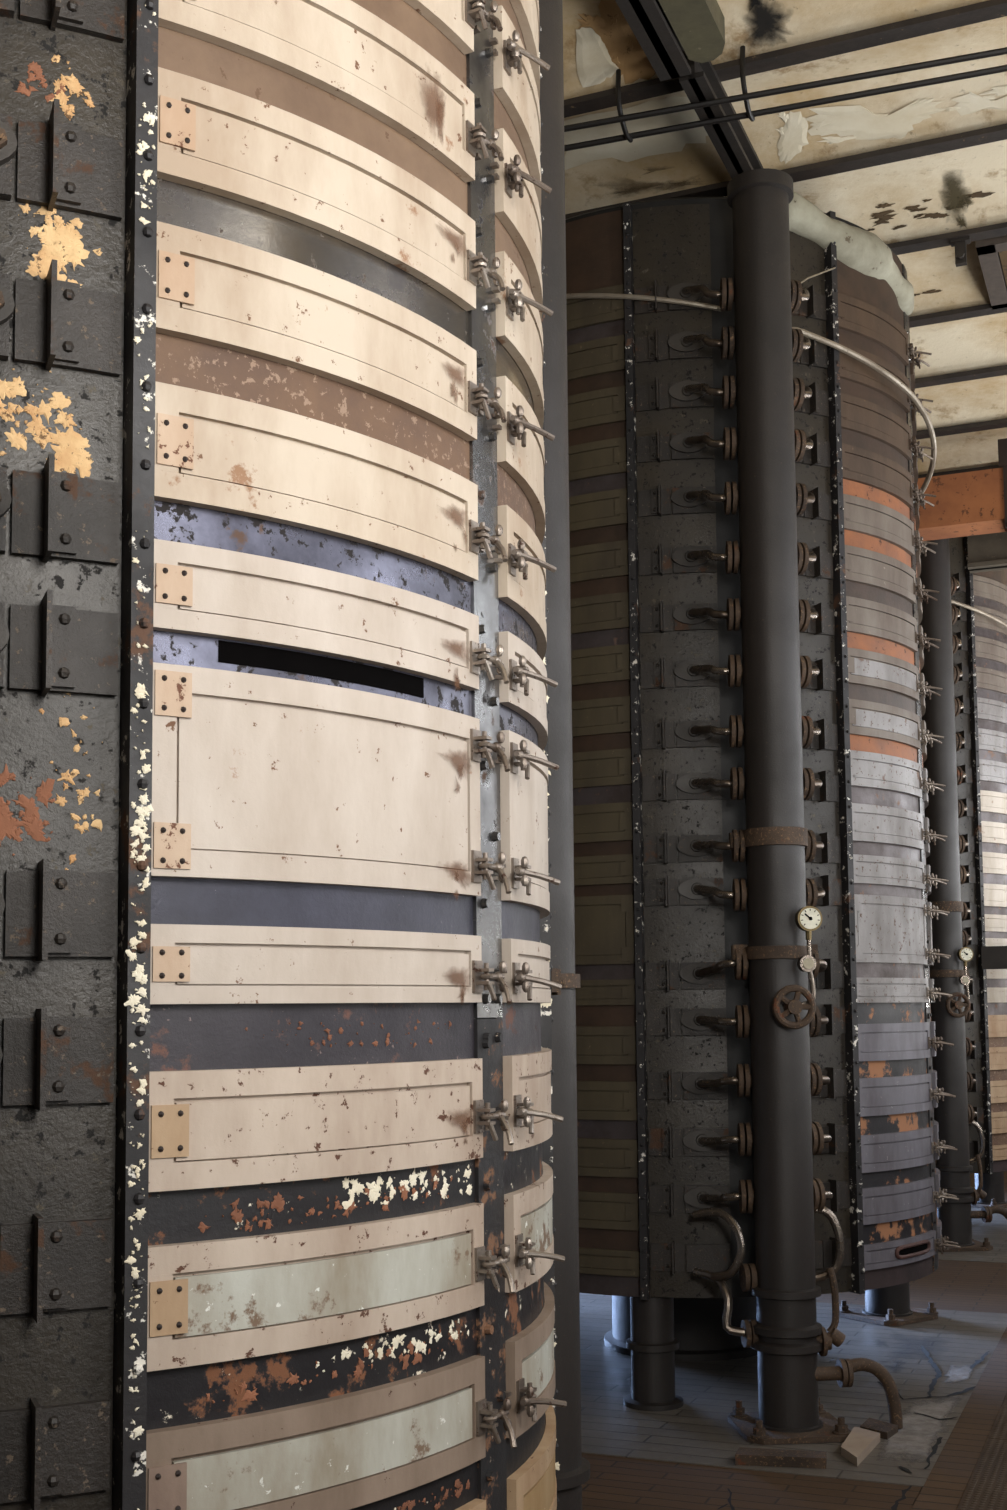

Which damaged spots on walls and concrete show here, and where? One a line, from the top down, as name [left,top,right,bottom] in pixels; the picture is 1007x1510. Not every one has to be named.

peeling [14,55,95,120]
flaking render [775,85,1007,164]
leakage [943,176,973,227]
peeling [18,203,102,288]
peeling [0,369,94,478]
corrosion [0,764,55,856]
peeling [198,1165,472,1233]
peeling [206,1376,258,1403]
peeling [286,1319,469,1385]
crack [878,1346,990,1510]